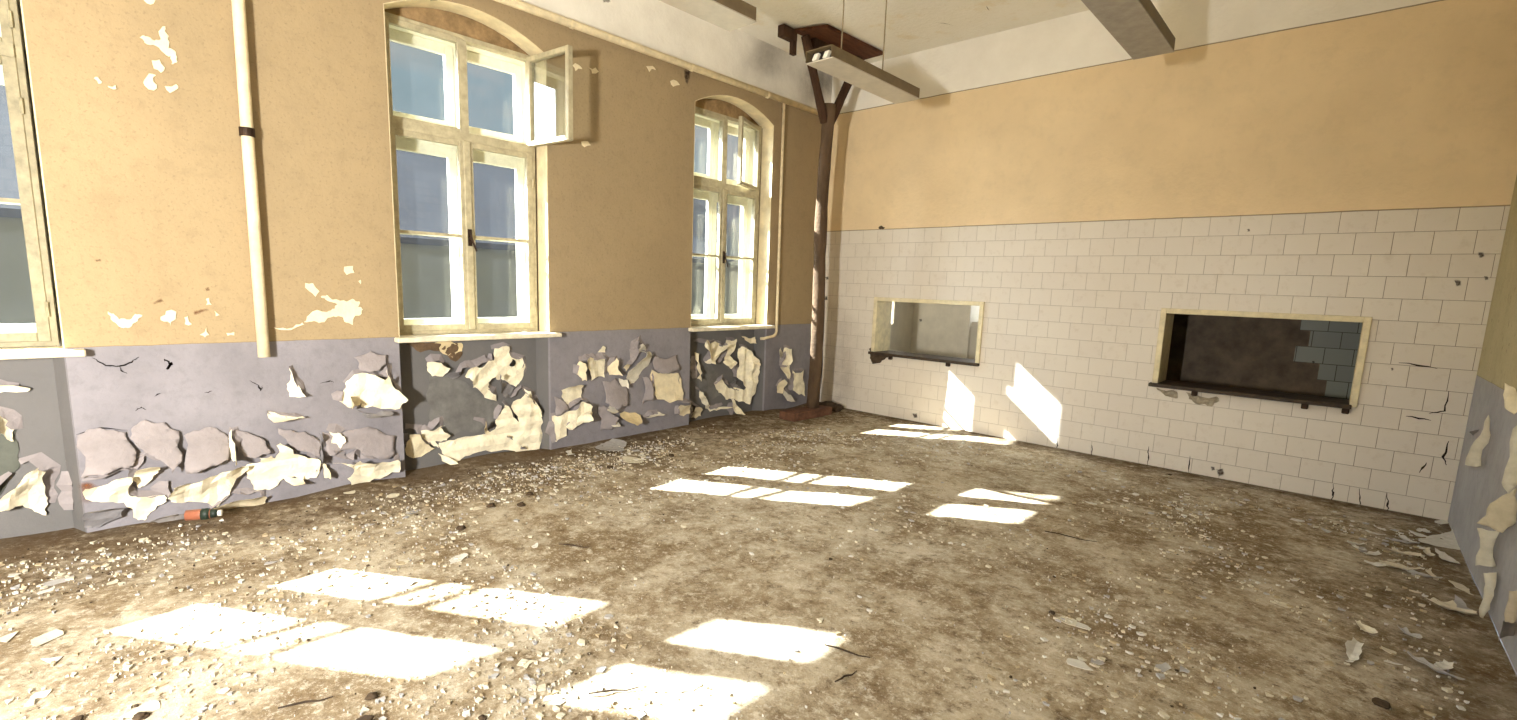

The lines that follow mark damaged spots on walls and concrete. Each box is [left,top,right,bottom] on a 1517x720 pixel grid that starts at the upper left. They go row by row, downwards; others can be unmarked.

peeling [140,26,178,93]
peeling [108,312,142,328]
peeling [160,310,209,337]
peeling [274,266,363,330]
peeling [776,345,805,402]
peeling [0,335,761,528]
peeling [1465,383,1517,641]